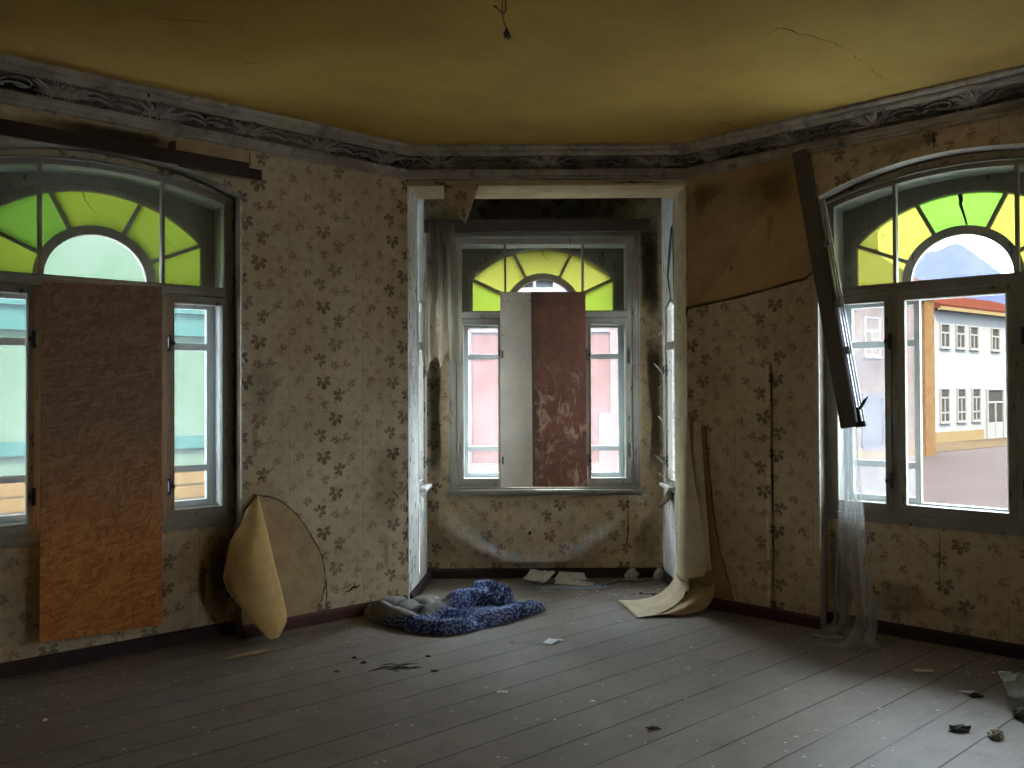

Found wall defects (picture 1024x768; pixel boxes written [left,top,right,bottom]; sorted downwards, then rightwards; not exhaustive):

peeling [678,158,796,323]
peeling [240,200,325,617]
peeling [689,419,733,600]